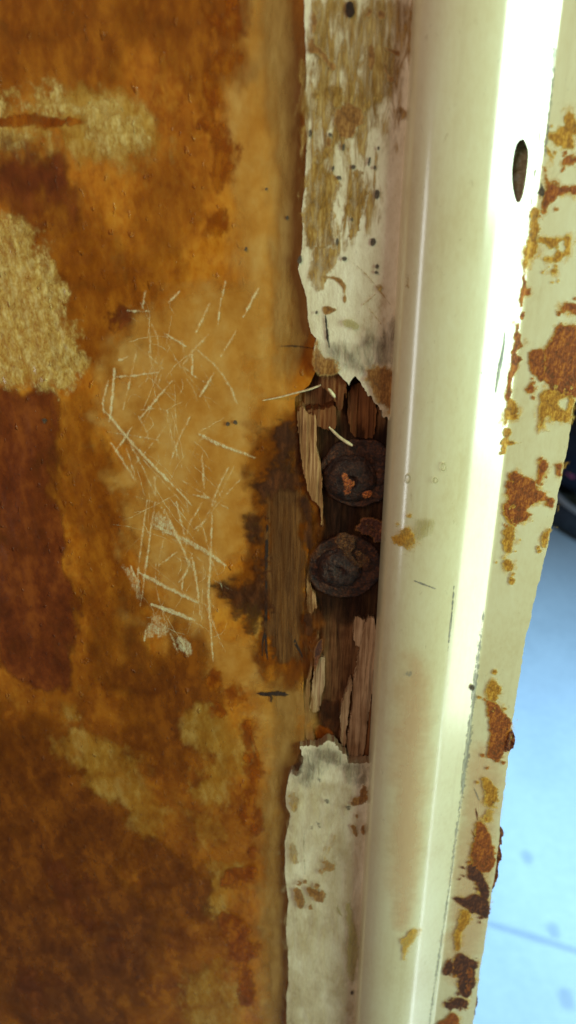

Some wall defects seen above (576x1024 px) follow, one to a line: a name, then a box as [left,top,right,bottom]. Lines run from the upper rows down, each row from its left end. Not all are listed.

corrosion [499,111,576,455]
corrosion [334,514,415,568]
corrosion [495,457,563,585]
corrosion [438,669,513,1024]